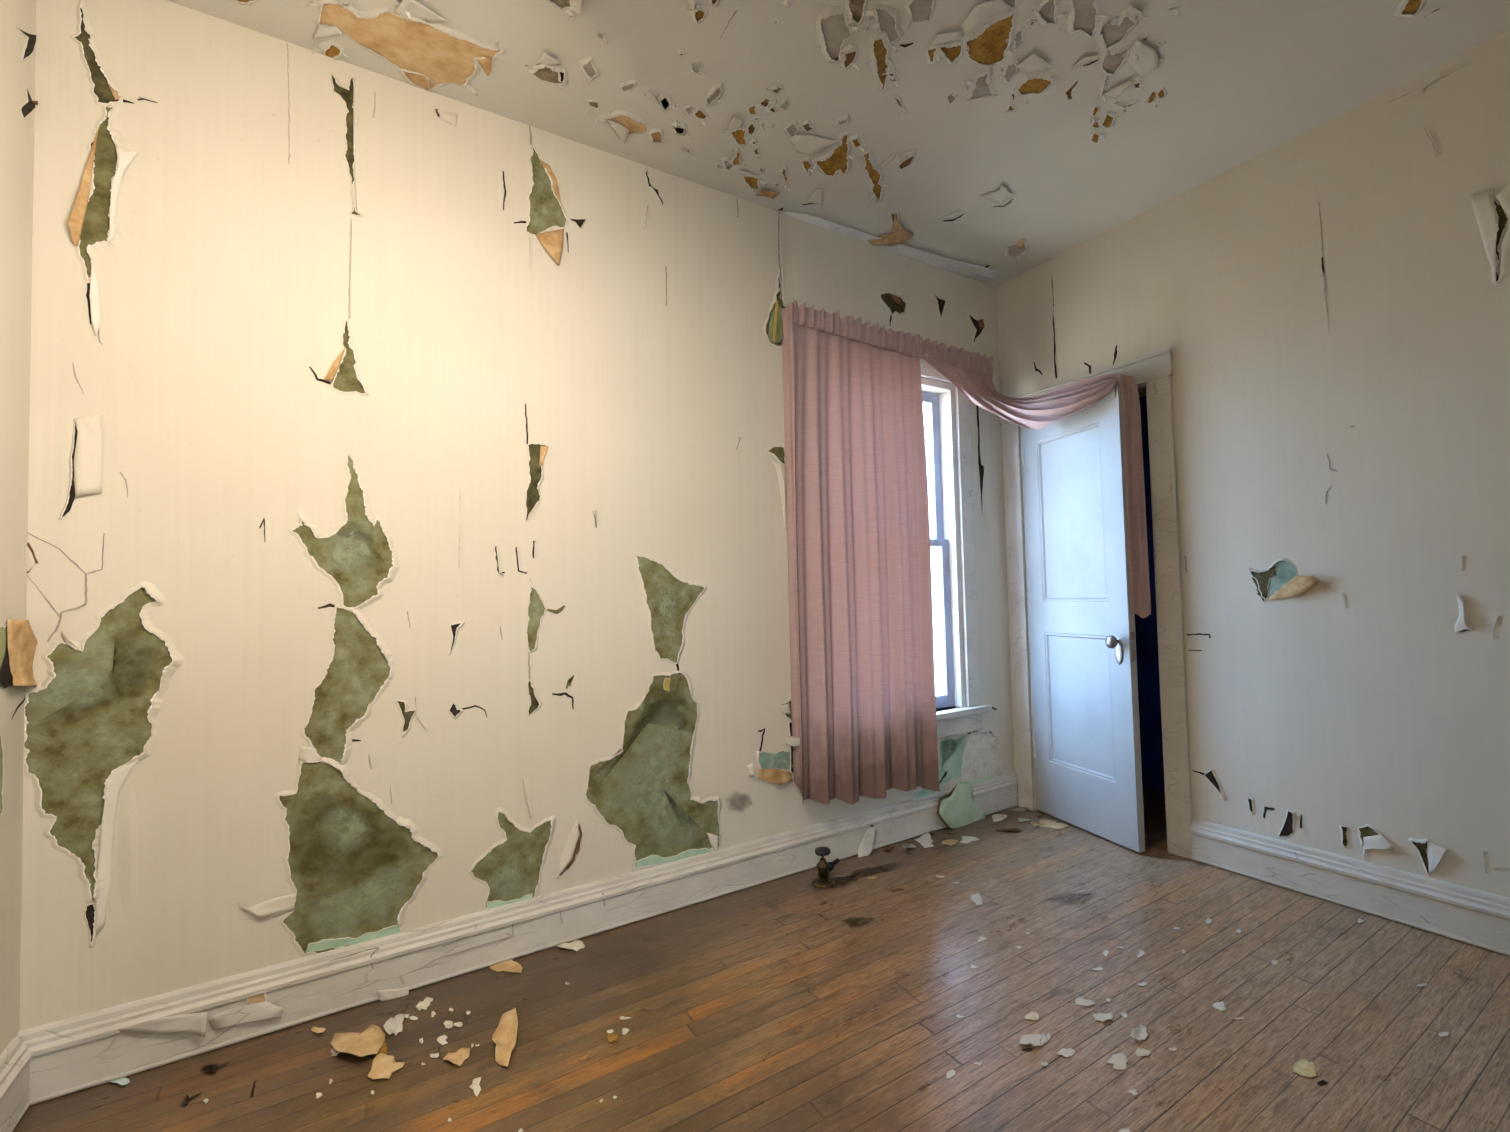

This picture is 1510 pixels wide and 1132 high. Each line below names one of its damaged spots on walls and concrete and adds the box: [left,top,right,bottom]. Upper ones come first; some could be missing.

peeling [303,0,507,96]
peeling [545,0,583,18]
peeling [525,53,725,155]
peeling [816,0,1168,144]
peeling [1394,0,1427,18]